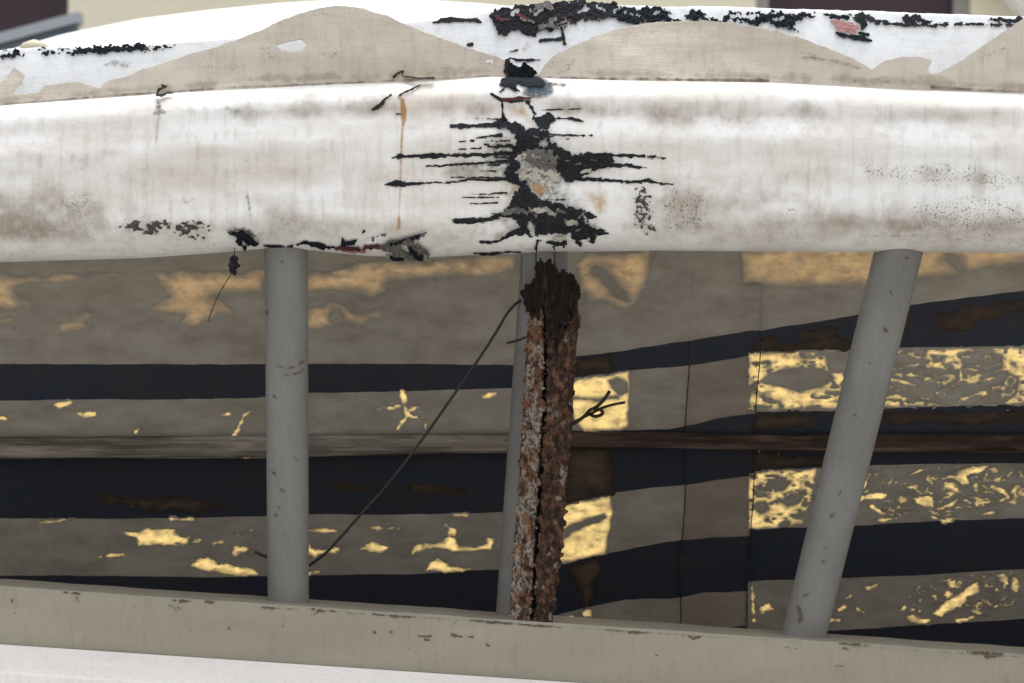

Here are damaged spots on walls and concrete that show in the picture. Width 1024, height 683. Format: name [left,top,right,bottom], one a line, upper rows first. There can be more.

peeling [0,48,25,60]
peeling [38,42,176,56]
peeling [490,49,545,103]
peeling [432,0,1023,45]
peeling [145,268,265,329]
peeling [748,326,852,433]
peeling [882,345,1024,426]
peeling [747,451,825,530]
peeling [857,464,1024,525]
peeling [121,515,259,577]
peeling [750,582,776,624]
peeling [899,569,1022,626]